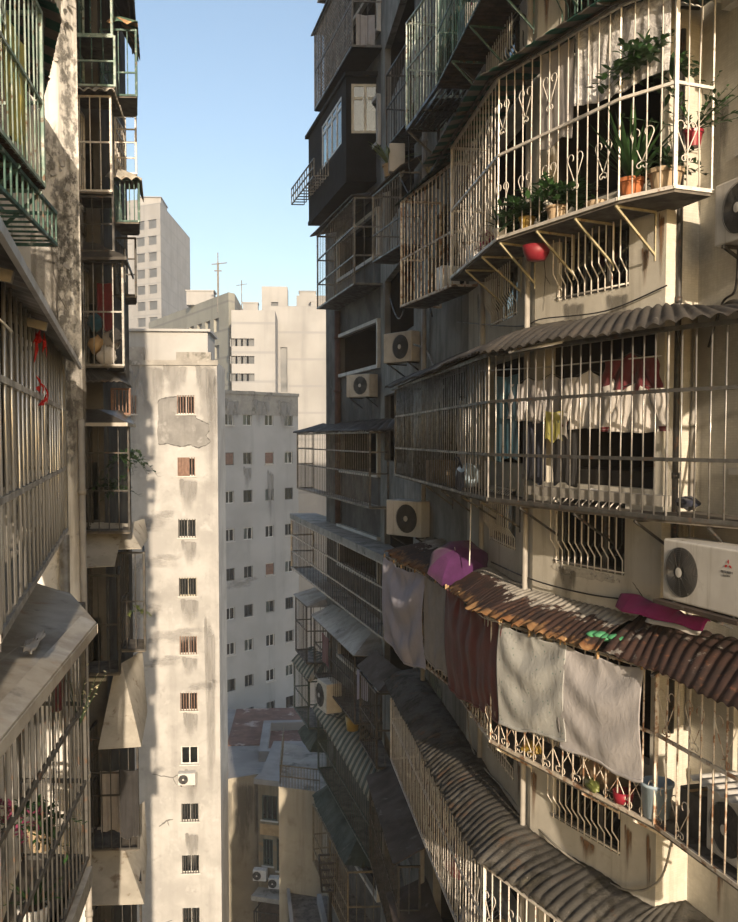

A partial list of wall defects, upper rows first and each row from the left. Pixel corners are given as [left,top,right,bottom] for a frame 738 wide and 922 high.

flaking render [157,396,211,449]